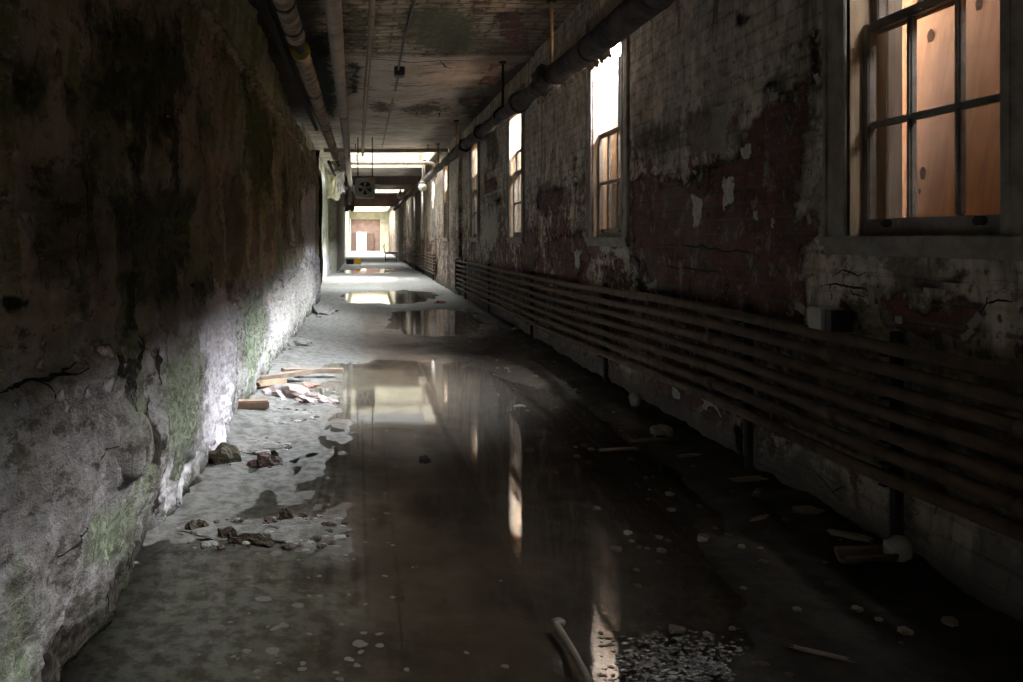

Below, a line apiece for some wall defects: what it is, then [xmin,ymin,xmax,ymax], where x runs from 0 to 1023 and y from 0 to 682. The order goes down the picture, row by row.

damp [371,98,448,116]
peeling [599,27,823,335]
damp [265,173,330,352]
crack [820,266,868,297]
crack [979,296,1013,314]
crack [0,361,91,398]
damp [159,259,238,512]